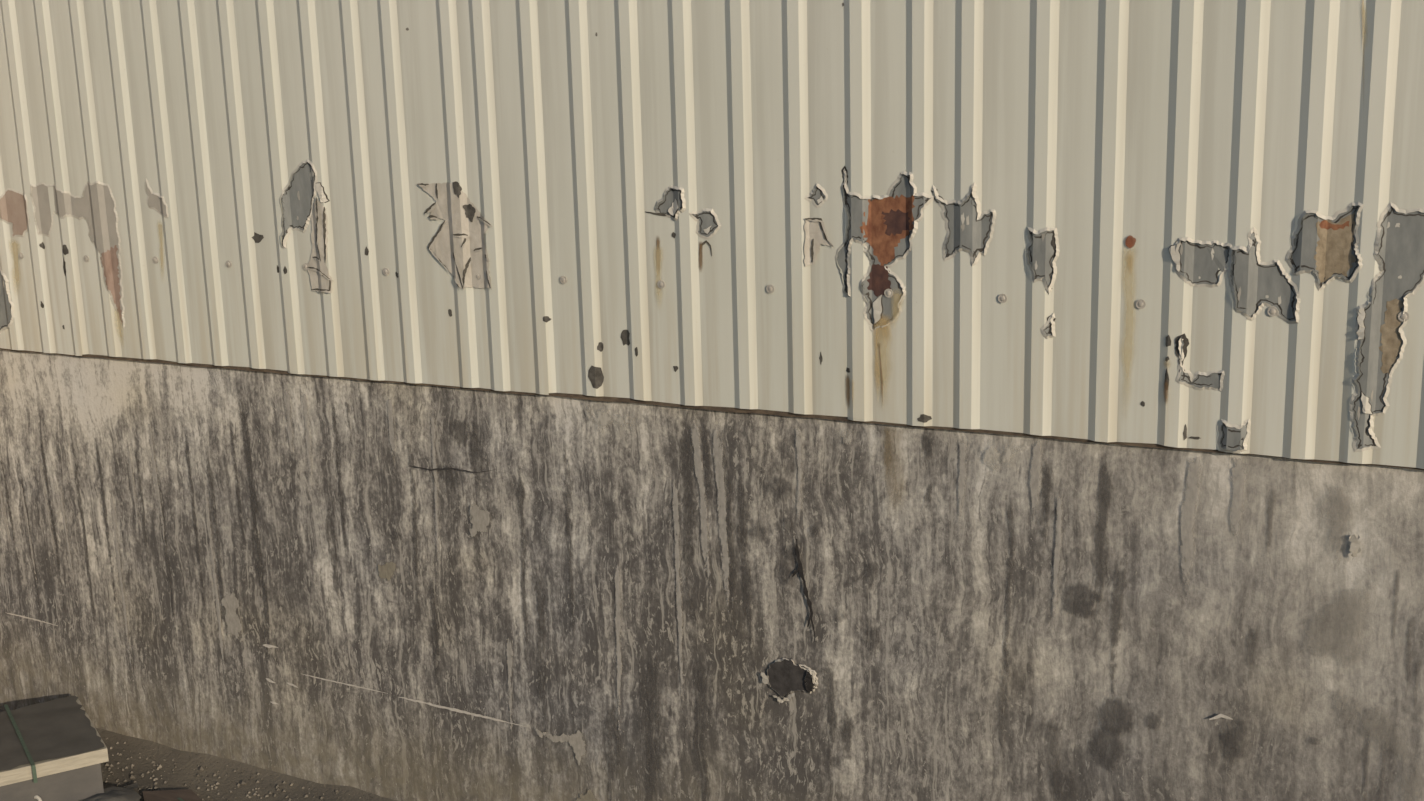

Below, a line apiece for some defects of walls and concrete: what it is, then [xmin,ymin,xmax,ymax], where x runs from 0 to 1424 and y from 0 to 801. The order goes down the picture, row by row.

peeling [0,181,125,335]
peeling [252,159,330,248]
peeling [804,166,997,348]
peeling [1025,227,1060,294]
corrosion [1125,235,1136,261]
peeling [1165,202,1424,454]
leakage [39,442,95,621]
leakage [231,400,270,657]
leakage [506,466,546,737]
leakage [672,420,751,801]
crack [792,539,815,641]
leakage [1029,441,1129,769]